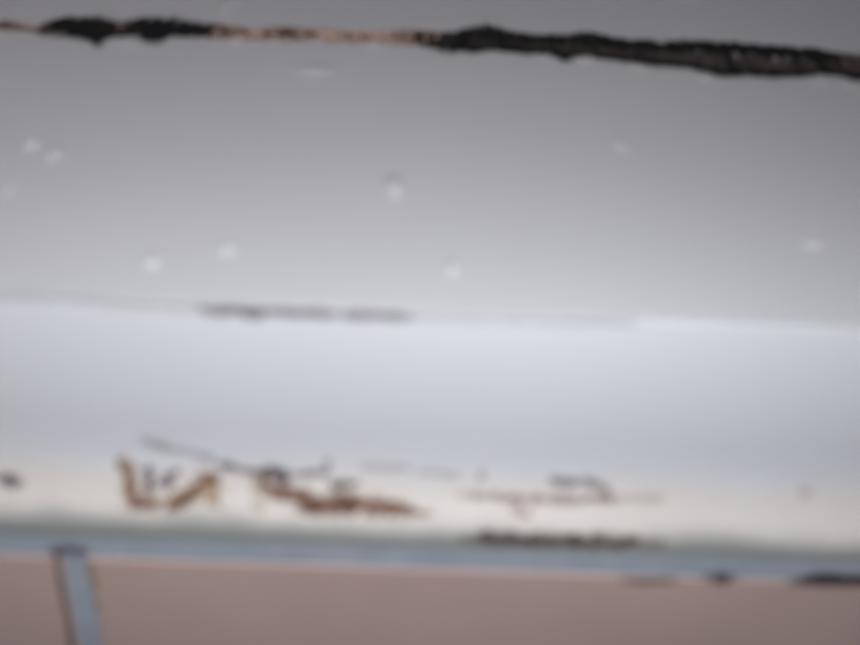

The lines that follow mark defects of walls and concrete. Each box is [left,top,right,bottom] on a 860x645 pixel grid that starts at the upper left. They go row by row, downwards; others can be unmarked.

crack [0,15,860,88]